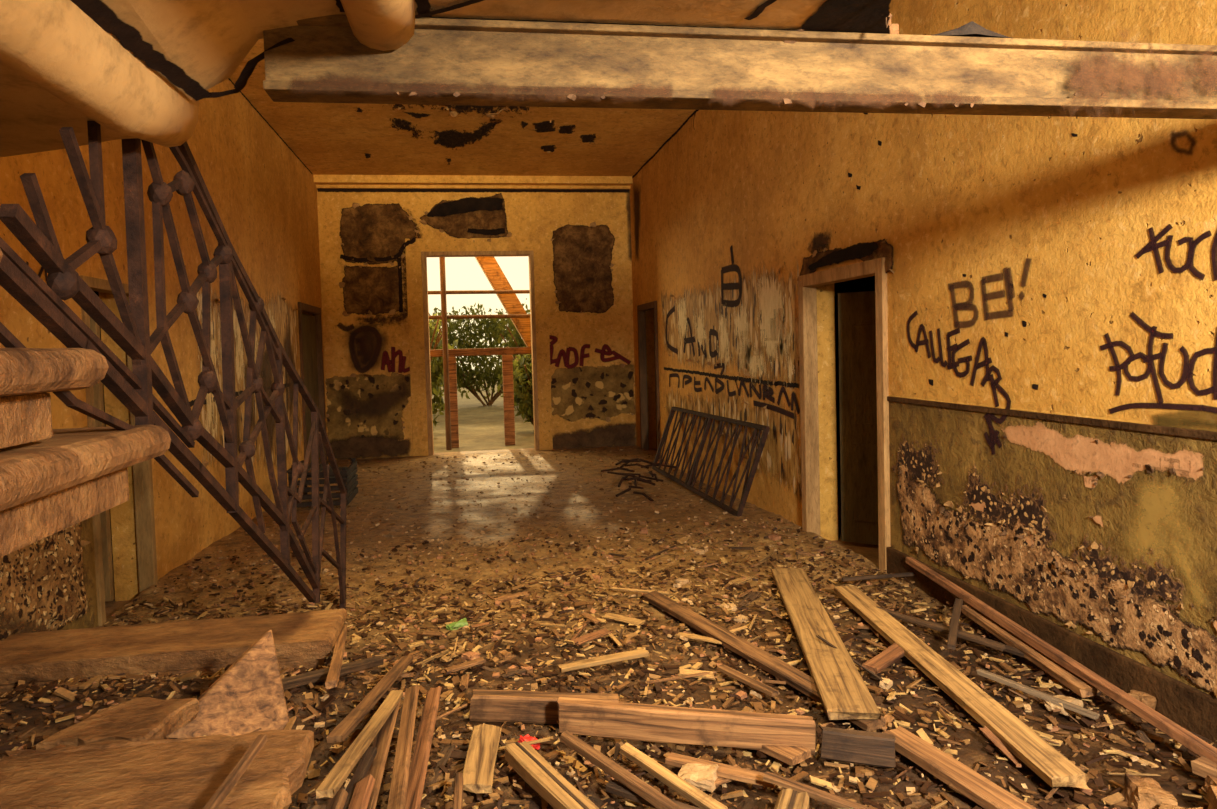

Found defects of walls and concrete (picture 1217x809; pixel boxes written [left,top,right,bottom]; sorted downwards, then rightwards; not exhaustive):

spalling [784,0,892,44]
peeling [382,104,596,165]
flaking render [339,193,512,327]
flaking render [550,222,615,314]
peeling [325,372,411,442]
peeling [1001,421,1204,490]
spalling [0,522,90,641]
spalling [896,461,1217,697]